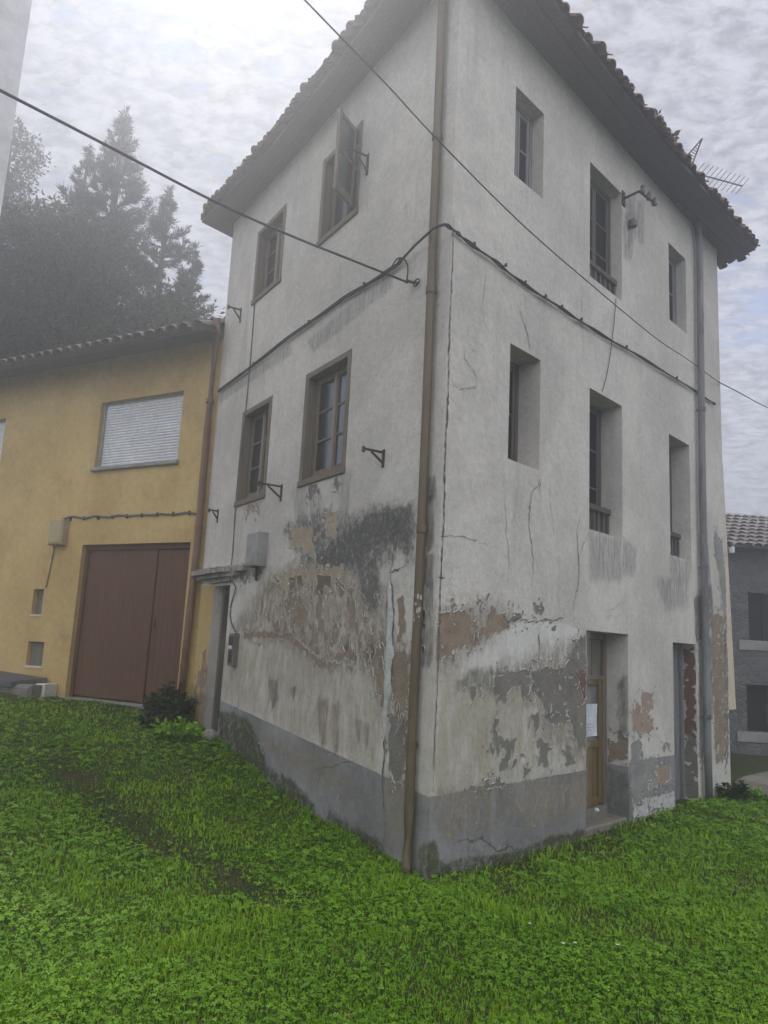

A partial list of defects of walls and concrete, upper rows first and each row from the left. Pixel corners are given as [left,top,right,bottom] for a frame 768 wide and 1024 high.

leakage [241,505,415,715]
peeling [236,475,588,803]
crack [433,224,586,782]
peeling [606,525,729,822]